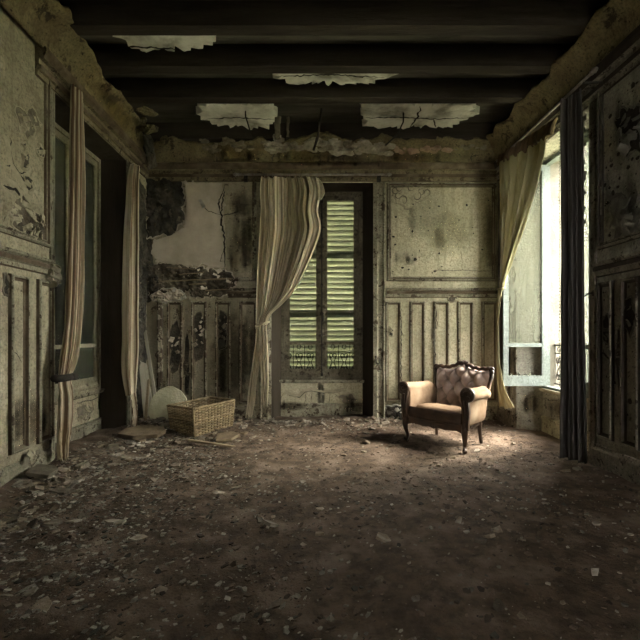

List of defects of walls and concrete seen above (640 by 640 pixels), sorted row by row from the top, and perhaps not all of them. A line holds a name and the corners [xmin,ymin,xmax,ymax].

spalling [113,35,216,53]
spalling [272,74,397,86]
spalling [196,103,453,156]
spalling [360,103,480,129]
peeling [614,103,640,159]
peeling [9,105,48,249]
crack [205,189,235,271]
spalling [136,178,238,417]